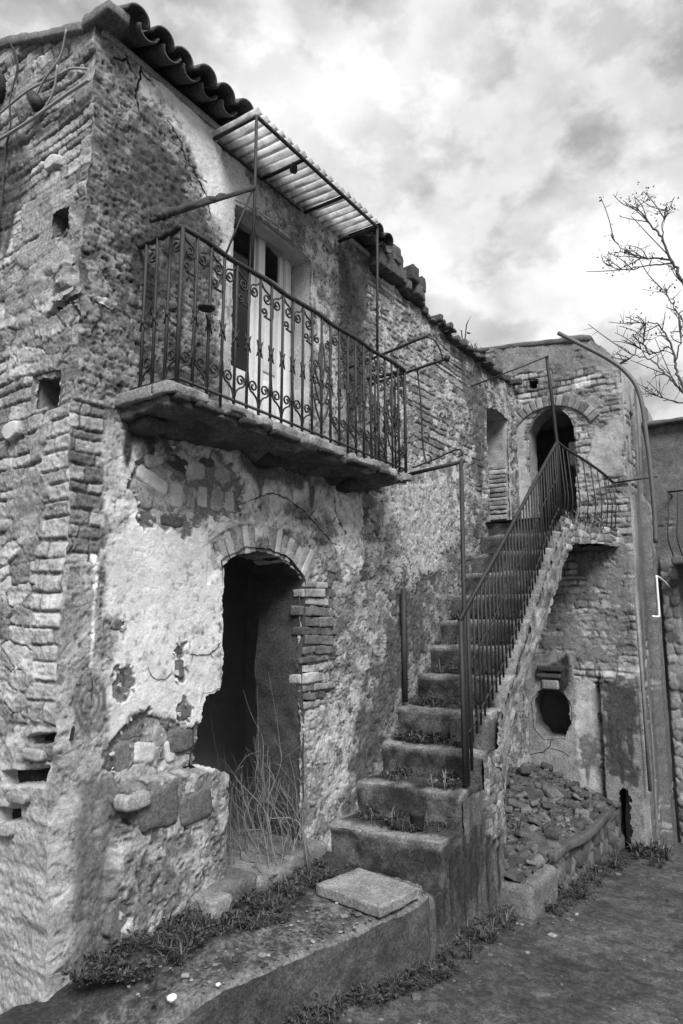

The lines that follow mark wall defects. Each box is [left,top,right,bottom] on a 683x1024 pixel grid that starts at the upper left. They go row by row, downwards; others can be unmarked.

crack [113,57,151,109]
flaking render [128,444,245,532]
crack [234,490,346,555]
flaking render [117,664,135,695]
flaking render [109,701,212,833]
water stain [577,675,643,789]